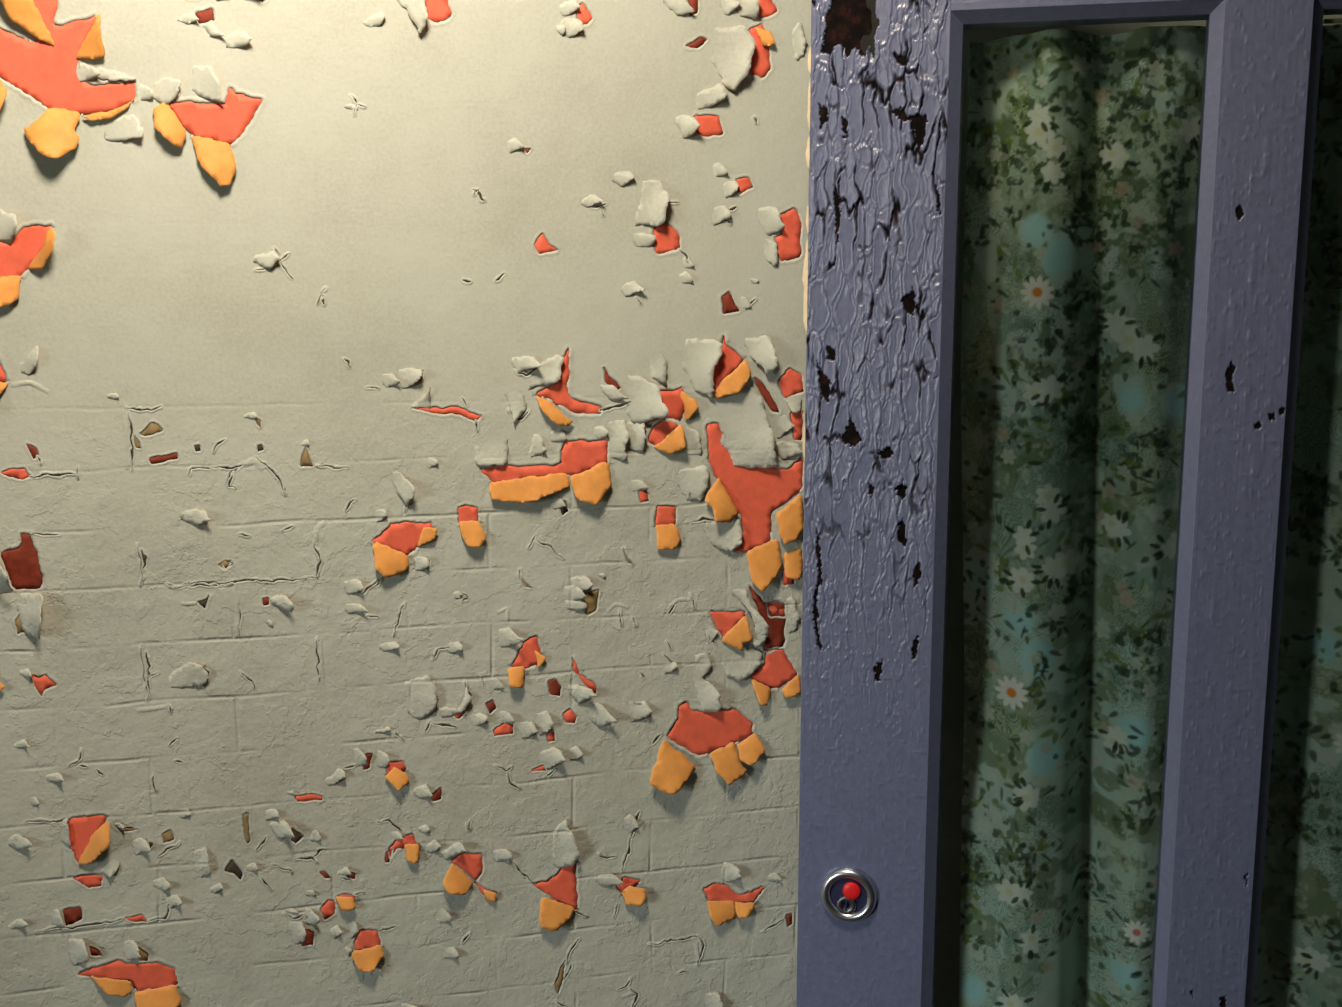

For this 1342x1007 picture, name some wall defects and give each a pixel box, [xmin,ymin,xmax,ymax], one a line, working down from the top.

peeling [0,0,269,187]
peeling [397,0,456,33]
peeling [0,209,57,307]
peeling [612,171,695,284]
peeling [758,204,809,331]
peeling [0,528,62,639]
peeling [344,472,438,652]
peeling [364,278,806,794]
crack [796,0,1188,1007]
crack [1165,0,1314,1007]
peeling [8,797,398,1007]
peeling [374,817,646,932]